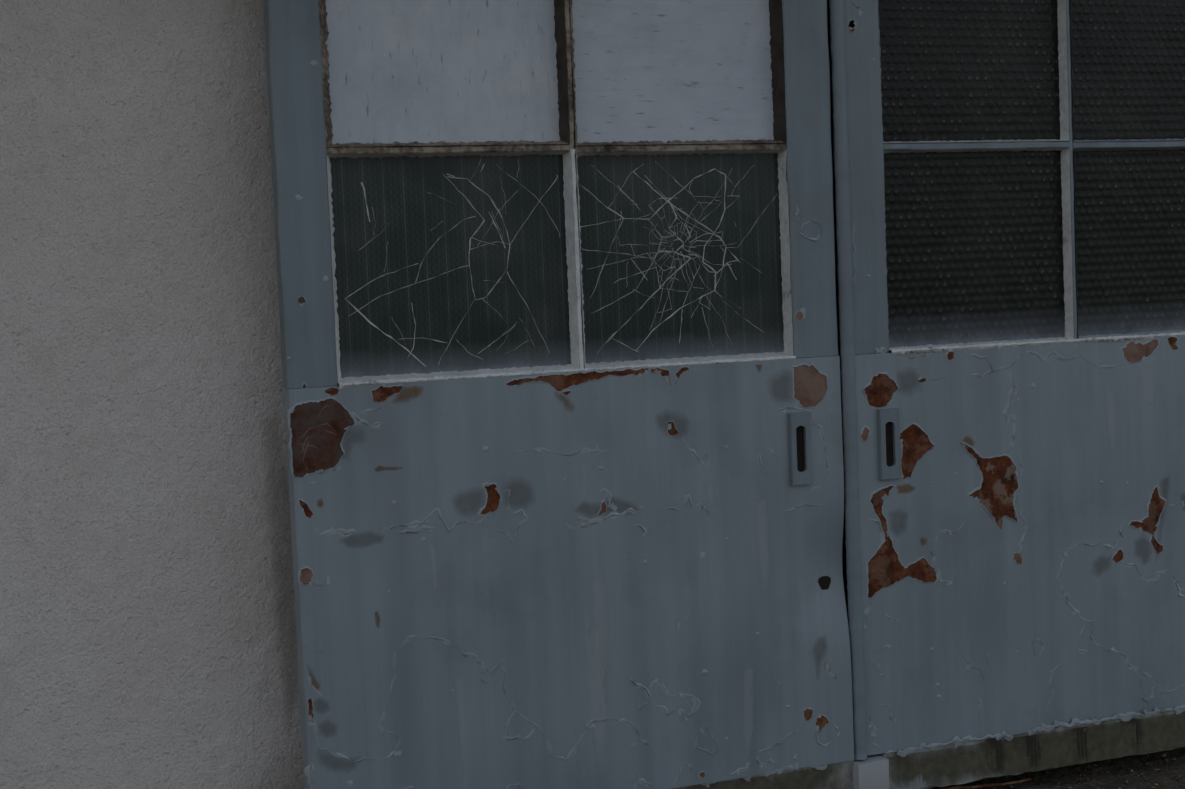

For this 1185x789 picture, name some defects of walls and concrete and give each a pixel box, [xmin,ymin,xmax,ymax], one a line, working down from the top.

peeling [505,366,690,397]
peeling [298,498,313,519]
peeling [477,482,502,517]
peeling [1111,548,1124,564]
peeling [803,707,830,733]